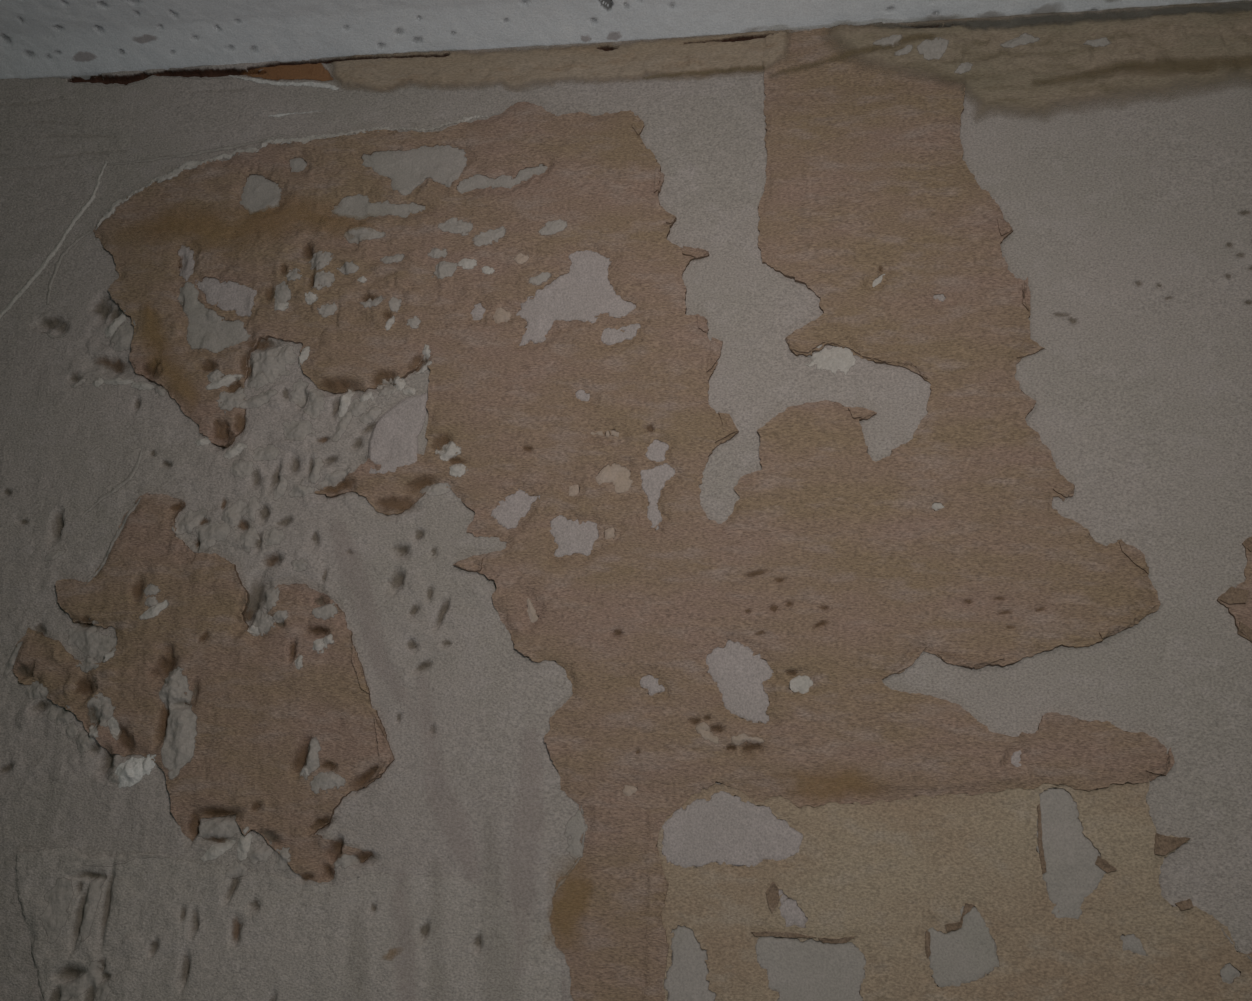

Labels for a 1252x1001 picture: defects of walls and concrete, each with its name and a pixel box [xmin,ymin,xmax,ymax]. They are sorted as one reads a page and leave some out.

peeling [332,30,788,91]
peeling [829,9,1252,114]
flaking render [331,194,425,220]
flaking render [177,282,251,353]
flaking render [516,250,641,346]
flaking render [550,515,599,557]
flaking render [640,463,676,530]
peeling [1216,536,1252,643]
peeling [4,493,395,883]
flaking render [706,640,774,724]
flaking render [1039,788,1106,919]
flaking render [927,907,999,987]